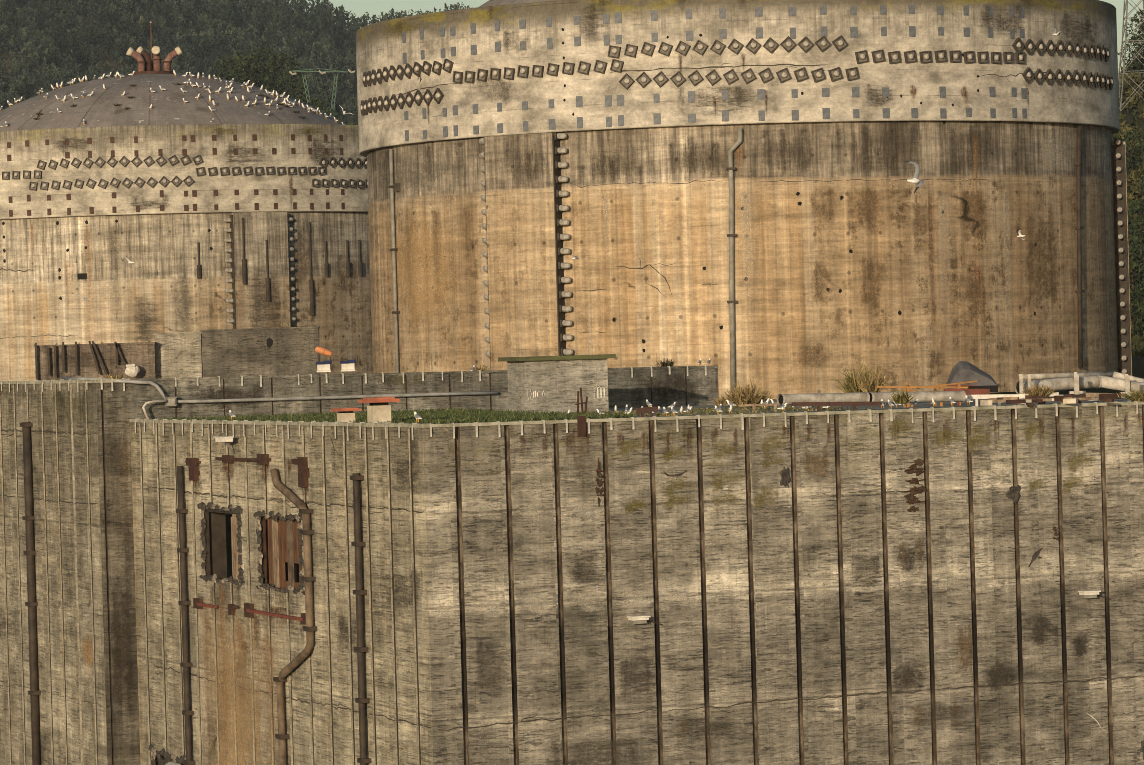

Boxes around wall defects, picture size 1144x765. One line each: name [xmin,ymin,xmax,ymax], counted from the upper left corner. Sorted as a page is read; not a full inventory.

damp [669,138,719,174]
damp [837,128,904,170]
crack [582,257,675,297]